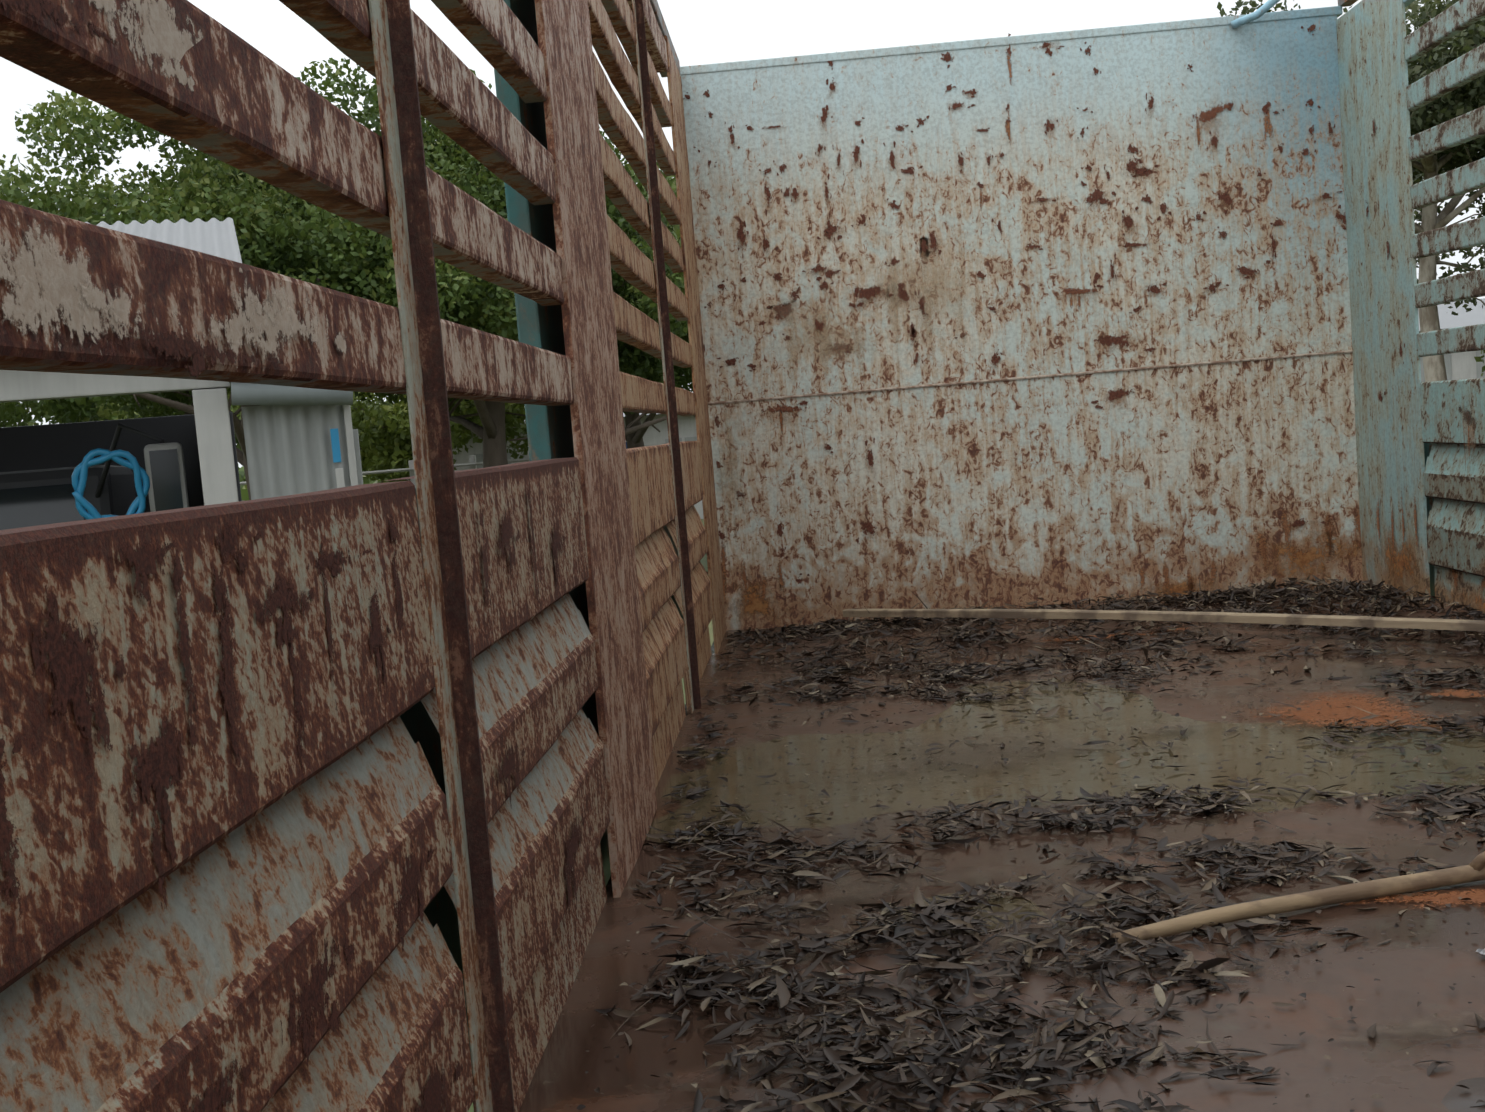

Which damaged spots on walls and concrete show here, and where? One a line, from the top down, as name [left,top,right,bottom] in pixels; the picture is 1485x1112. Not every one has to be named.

rust [1192,100,1234,145]
rust [1262,102,1273,140]
rust [107,319,284,378]
rust [761,401,809,433]
rust [1059,285,1103,308]
rust [17,540,198,909]
rust [211,521,262,768]
rust [255,541,372,774]
rust [368,508,406,695]
rust [480,481,566,629]
rust [0,727,22,920]
rust [280,932,355,1066]